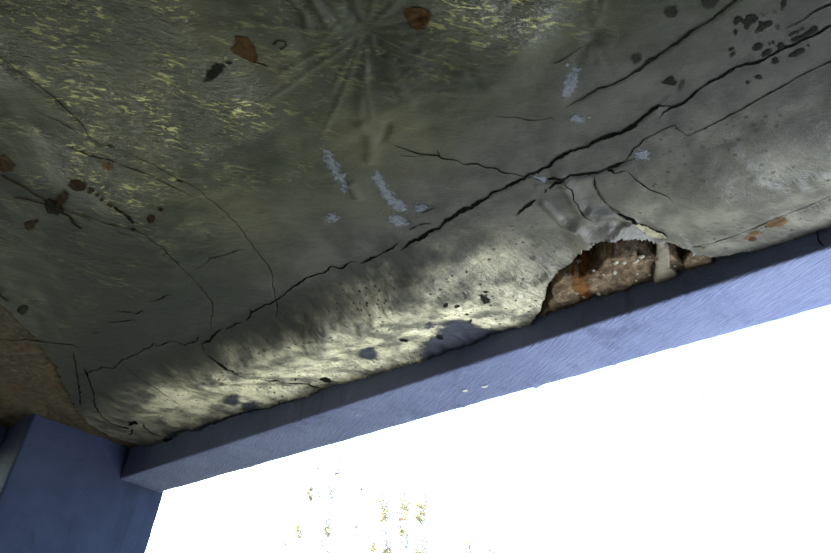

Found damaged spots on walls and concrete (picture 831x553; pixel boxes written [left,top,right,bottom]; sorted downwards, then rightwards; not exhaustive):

crack [0,0,831,442]
spalling [540,224,714,318]
water stain [360,347,377,360]
water stain [419,320,516,360]